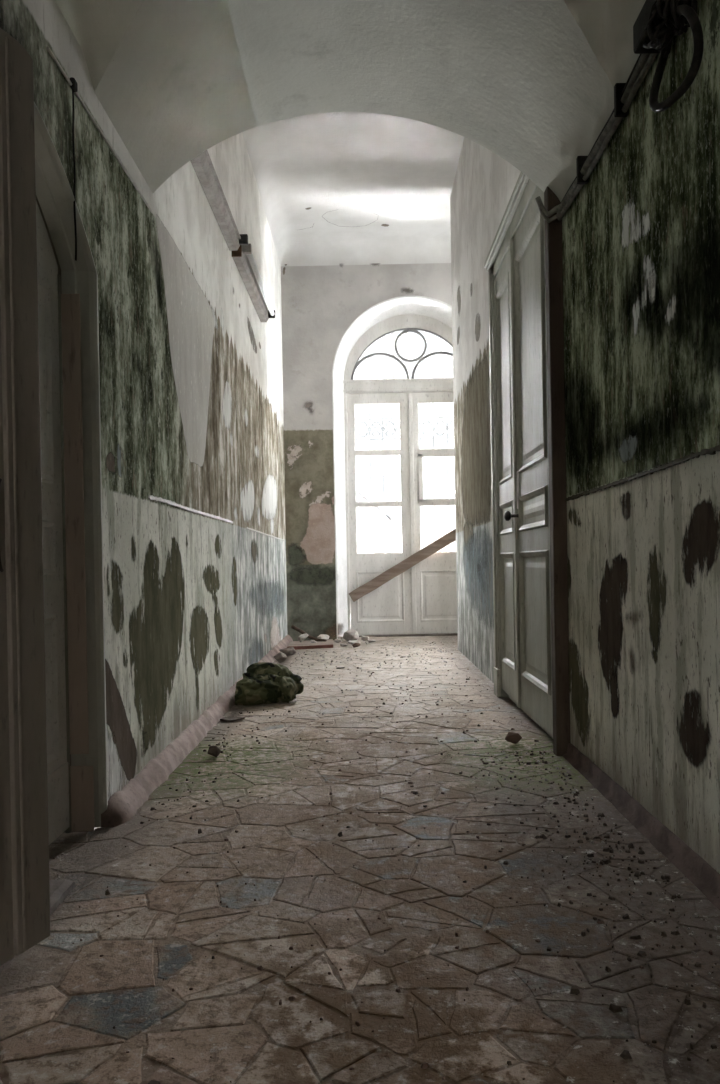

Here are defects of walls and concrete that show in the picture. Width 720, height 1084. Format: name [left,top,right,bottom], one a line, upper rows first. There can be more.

water stain [151,242,161,300]
water stain [624,213,720,373]
peeling [222,381,248,447]
peeling [287,441,313,470]
water stain [564,372,707,479]
peeling [148,475,284,541]
spalling [299,481,335,565]
water stain [681,499,720,588]
water stain [107,535,237,757]
water stain [598,545,666,718]
water stain [569,639,590,747]
water stain [677,689,711,768]